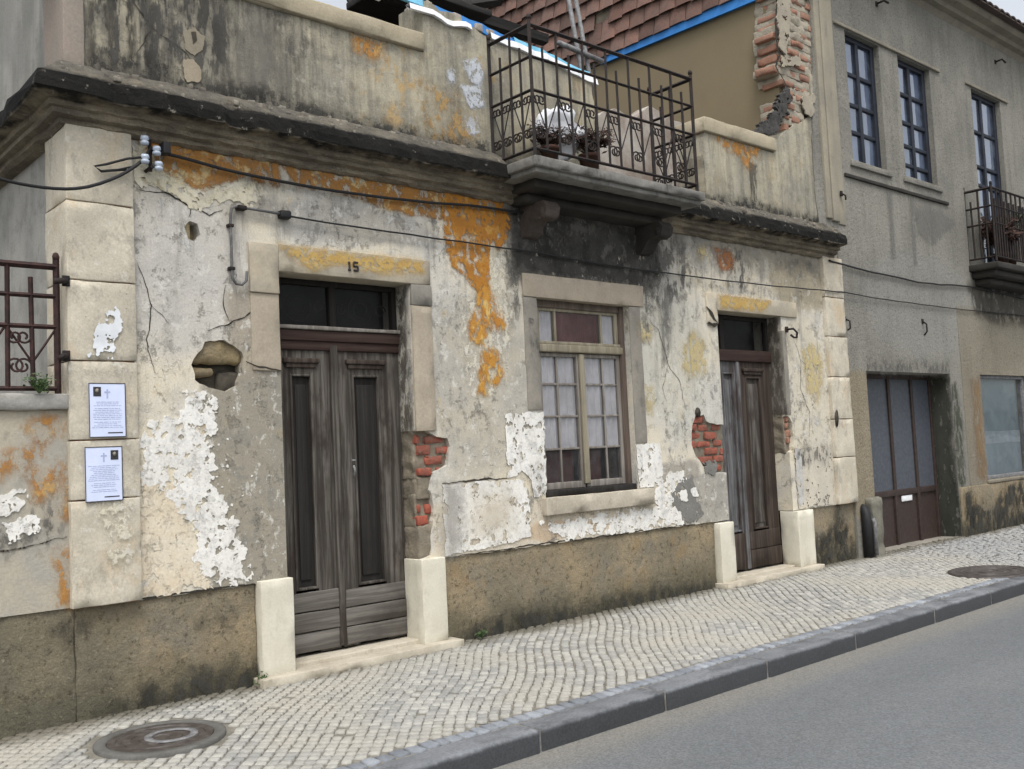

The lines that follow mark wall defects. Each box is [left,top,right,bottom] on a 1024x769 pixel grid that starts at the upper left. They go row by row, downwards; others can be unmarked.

damp [89,0,416,136]
flaking render [753,0,816,136]
spalling [185,222,194,240]
peeling [132,145,264,212]
peeling [87,306,123,360]
crack [138,266,166,372]
peeling [0,489,41,544]
peeling [138,340,254,598]
flaking render [403,494,431,527]
flaking render [401,431,448,480]
peeling [539,407,724,541]
damp [867,362,1024,537]